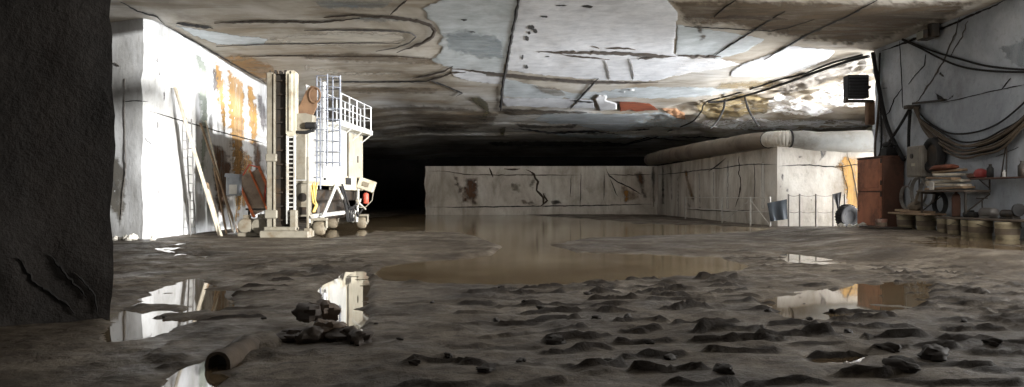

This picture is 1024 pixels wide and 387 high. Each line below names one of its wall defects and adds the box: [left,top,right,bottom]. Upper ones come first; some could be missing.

corrosion [213,65,257,221]
water stain [455,177,478,204]
crack [114,0,877,217]
spalling [422,0,868,139]
corrosion [619,102,685,119]
corrosion [837,157,858,208]
crack [882,0,1022,114]
crack [17,254,98,314]